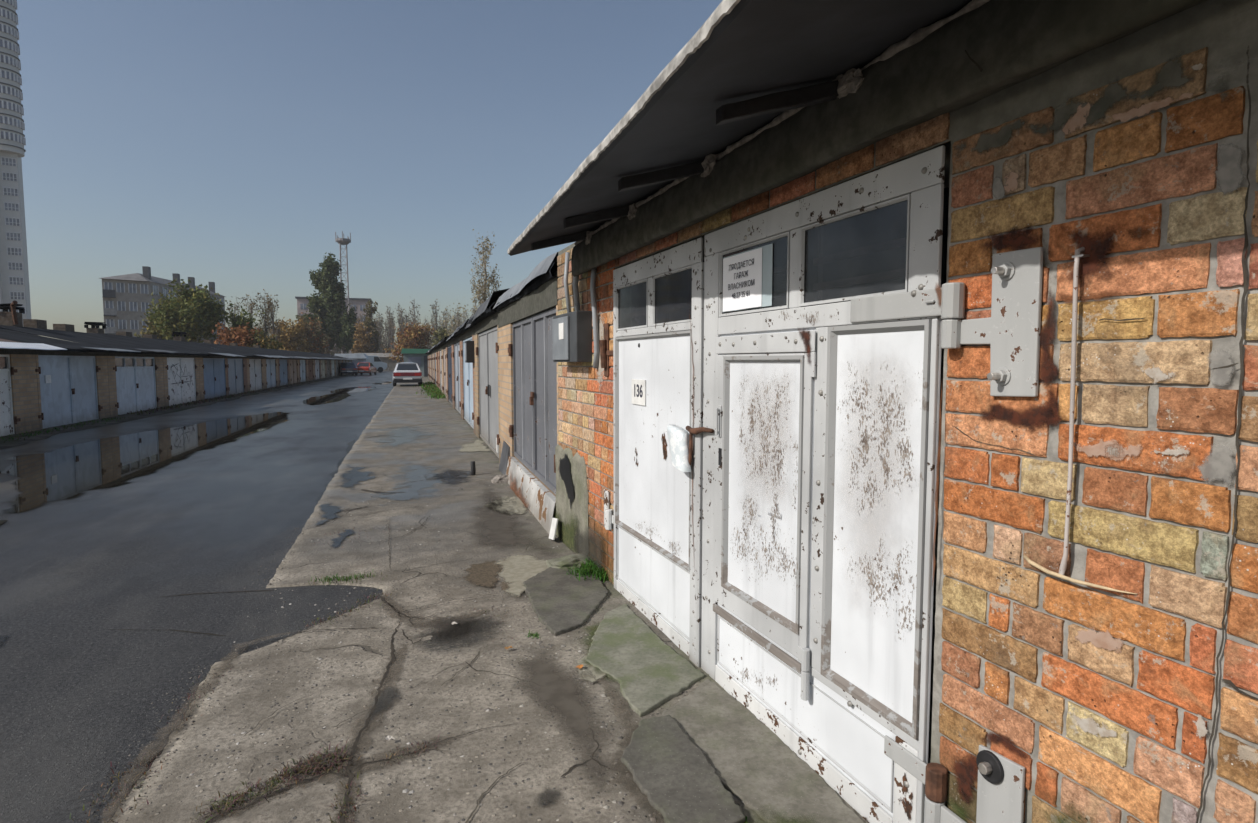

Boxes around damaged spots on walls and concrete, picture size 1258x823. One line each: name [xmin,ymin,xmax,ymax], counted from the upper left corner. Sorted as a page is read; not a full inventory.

flaking render [955,54,1203,156]
corrosion [980,226,1147,431]
corrosion [510,477,528,507]
crack [1196,46,1258,823]
crack [206,435,511,823]